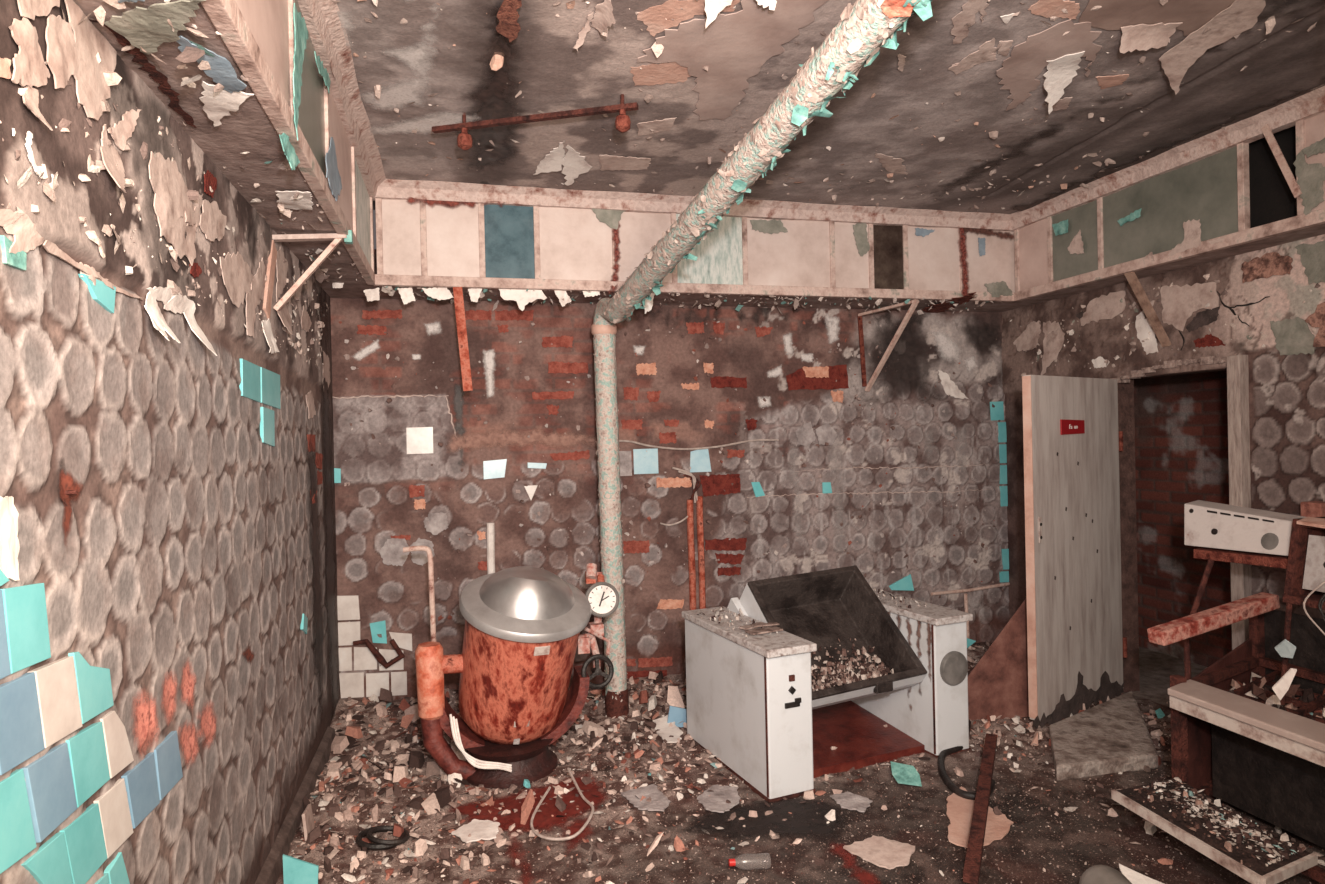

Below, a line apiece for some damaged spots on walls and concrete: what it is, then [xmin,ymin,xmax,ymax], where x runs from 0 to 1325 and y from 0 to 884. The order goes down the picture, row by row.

peeling [0,0,254,193]
peeling [279,3,331,170]
peeling [630,0,828,120]
peeling [948,0,1266,114]
peeling [533,141,651,186]
peeling [144,151,314,356]
spalling [1241,241,1325,284]
peeling [357,287,600,335]
flaking render [786,365,849,403]
peeling [1013,321,1065,375]
peeling [1076,282,1225,355]
peeling [0,496,20,581]